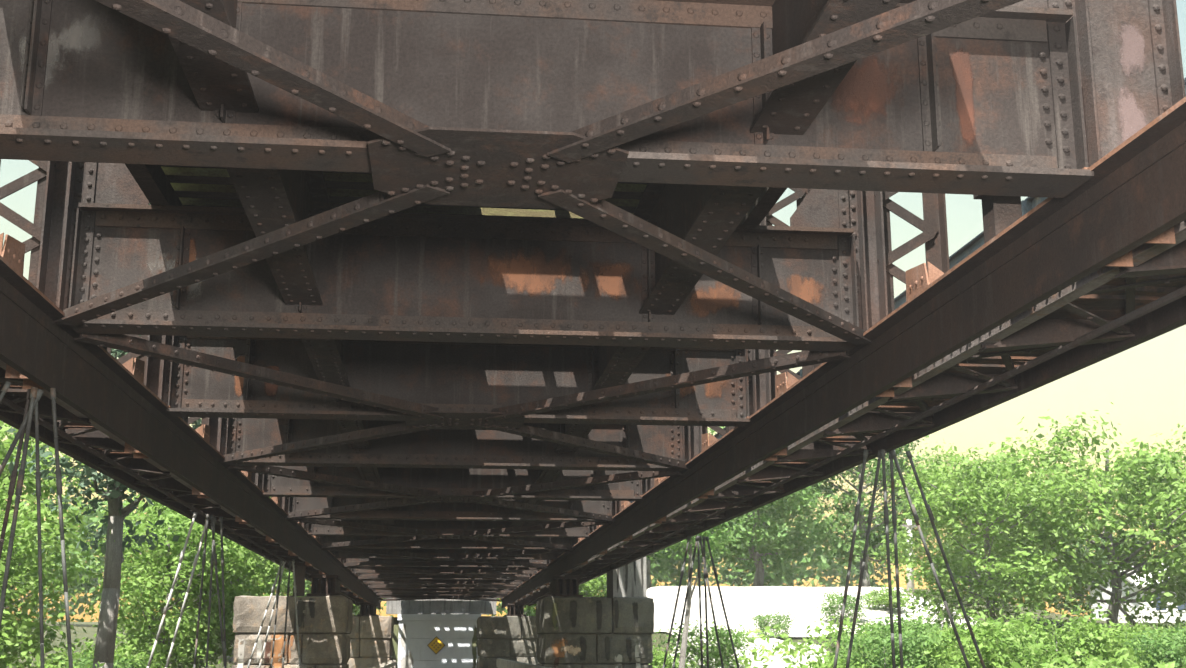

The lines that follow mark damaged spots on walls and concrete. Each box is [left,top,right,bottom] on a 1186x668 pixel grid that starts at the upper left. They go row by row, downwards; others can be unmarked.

rust [950,49,975,144]
rust [686,284,739,317]
rust [787,274,823,303]